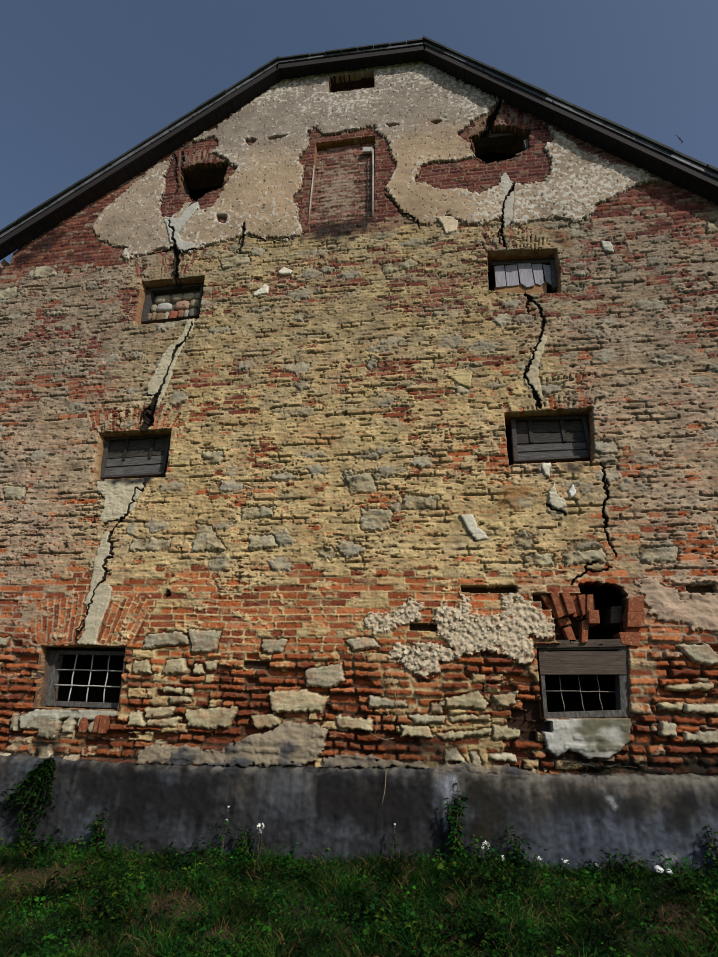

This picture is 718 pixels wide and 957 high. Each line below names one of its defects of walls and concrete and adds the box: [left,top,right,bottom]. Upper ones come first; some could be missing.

spalling [160,135,237,223]
spalling [293,123,416,244]
spalling [415,99,555,194]
crack [139,321,193,433]
crack [523,292,545,409]
crack [75,482,146,643]
crack [571,463,617,584]
spalling [362,581,628,681]
damp [35,735,57,757]
damp [70,758,218,821]
damp [270,765,506,846]
damp [558,788,647,816]